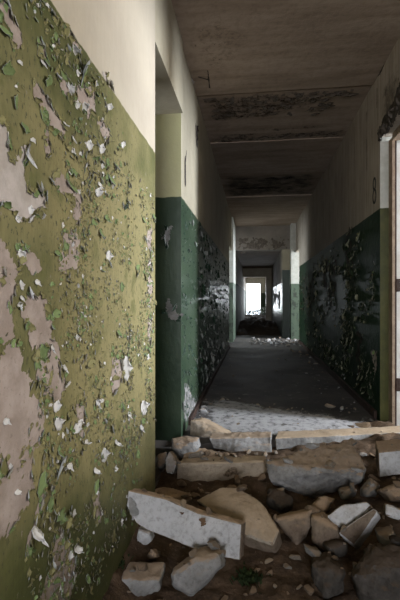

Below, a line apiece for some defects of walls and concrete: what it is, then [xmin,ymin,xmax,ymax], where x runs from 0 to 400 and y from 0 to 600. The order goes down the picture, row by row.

flaking render [377,78,400,142]
peeling [0,0,230,600]
peeling [298,227,377,403]